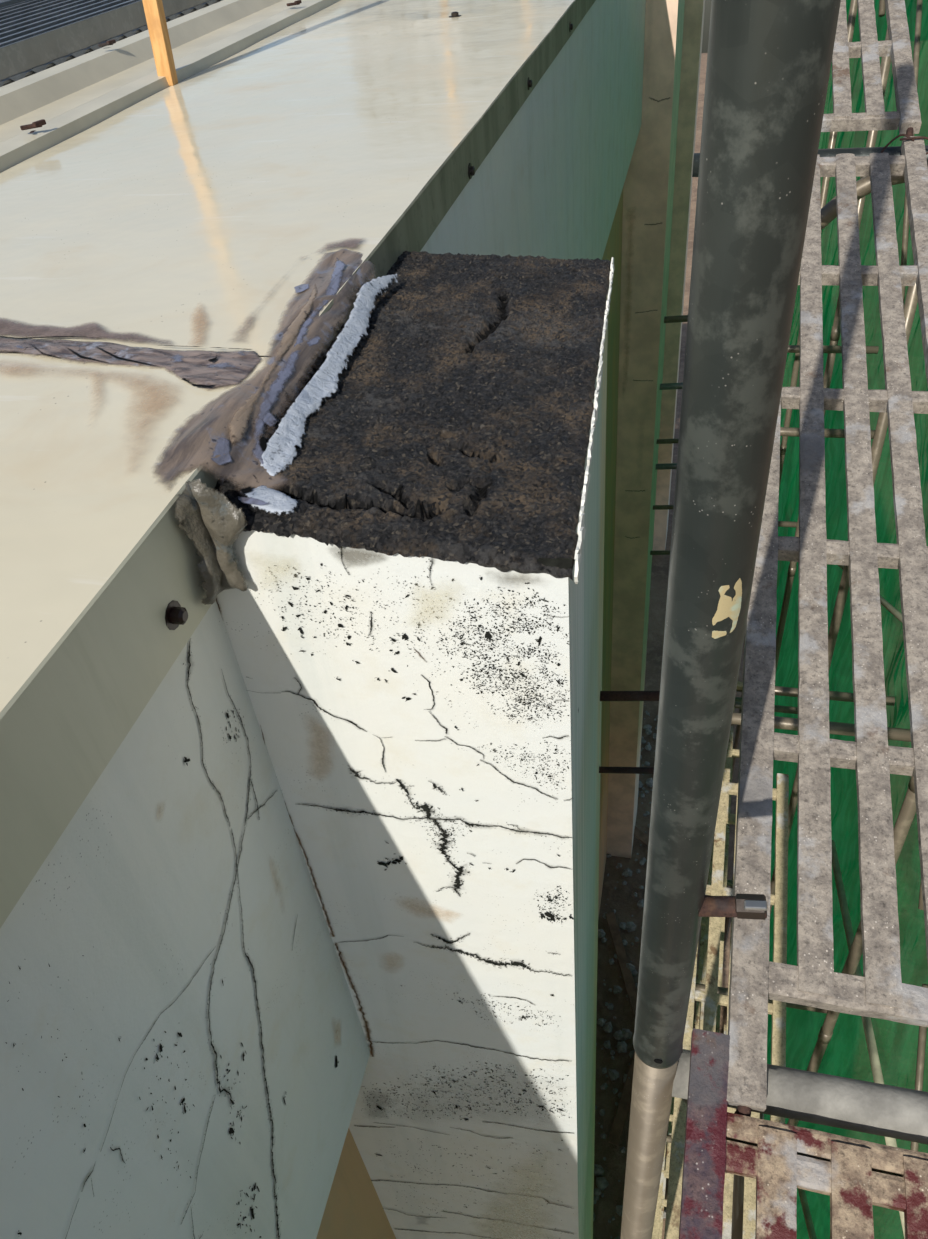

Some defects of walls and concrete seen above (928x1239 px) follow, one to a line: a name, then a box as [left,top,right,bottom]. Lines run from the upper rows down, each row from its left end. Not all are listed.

spalling [213,251,614,584]
leakage [260,549,569,725]
leakage [466,740,571,789]
crack [65,642,573,1239]
leakage [362,1061,572,1121]